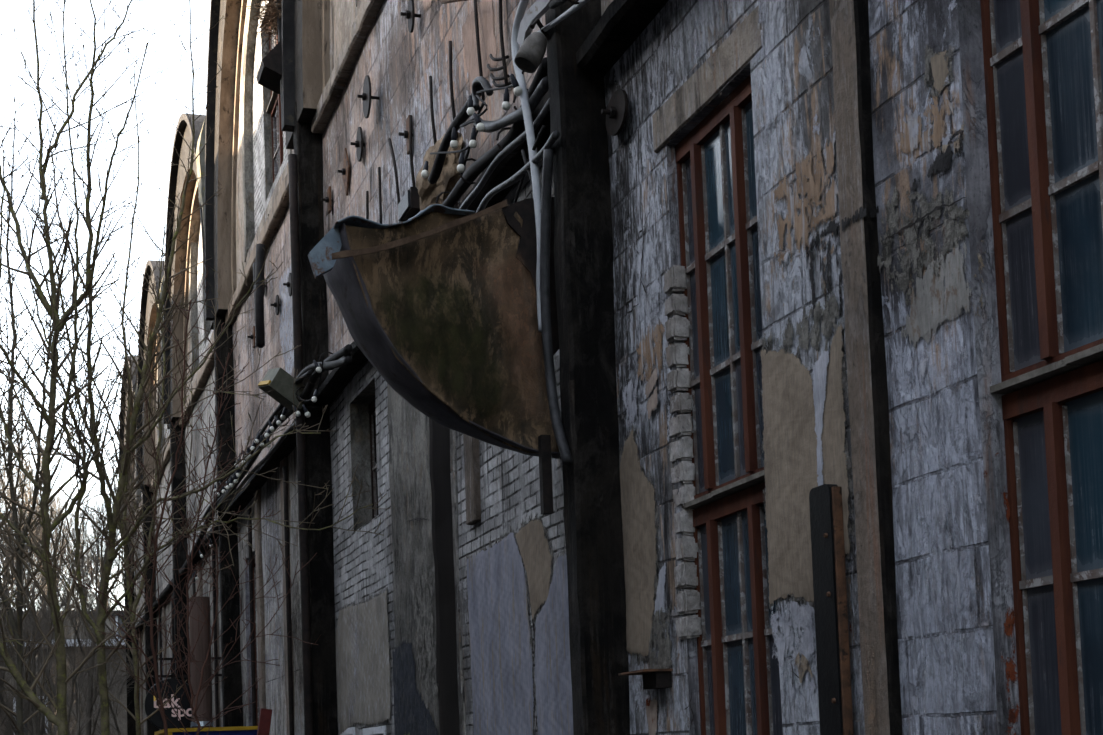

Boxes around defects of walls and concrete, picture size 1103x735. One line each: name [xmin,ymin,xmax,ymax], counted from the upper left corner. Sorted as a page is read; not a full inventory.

peeling [898,41,967,158]
peeling [762,113,845,365]
spalling [878,186,971,306]
spalling [636,322,665,419]
flaking render [466,514,574,735]
spalling [627,462,674,669]
peeling [767,594,817,735]
spalling [843,440,855,570]